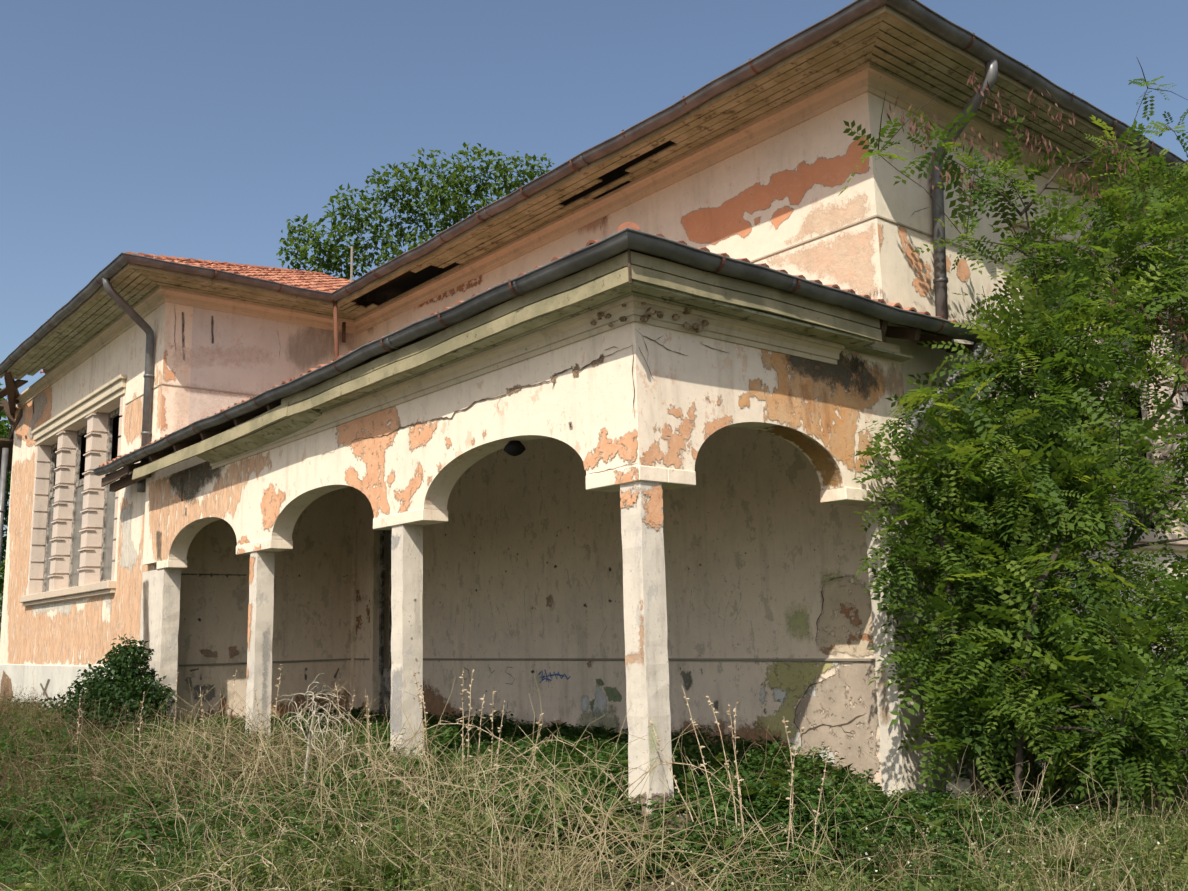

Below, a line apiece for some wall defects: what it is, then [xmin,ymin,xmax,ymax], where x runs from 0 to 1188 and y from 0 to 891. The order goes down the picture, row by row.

peeling [681,135,884,295]
peeling [898,226,932,297]
peeling [946,254,971,284]
peeling [335,406,454,518]
crack [321,330,727,459]
peeling [583,349,885,531]
damp [788,351,904,401]
peeling [0,386,286,710]
spalling [680,667,702,690]
spalling [749,574,881,783]